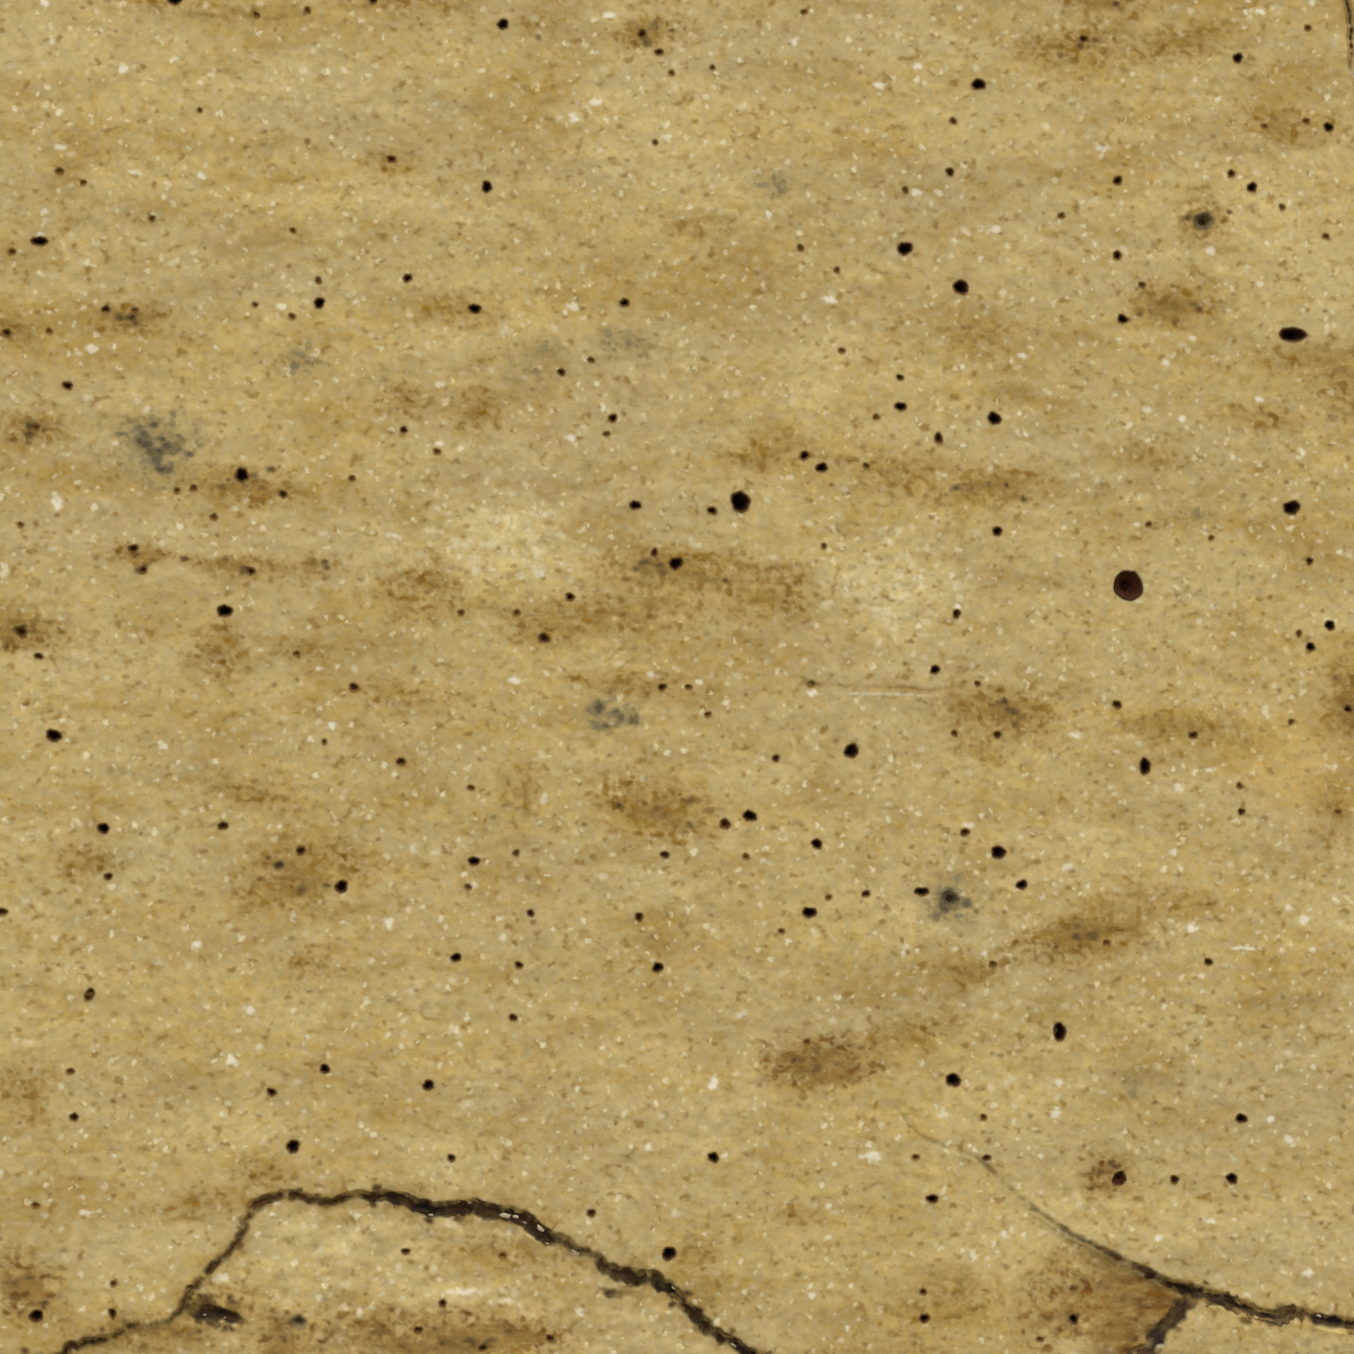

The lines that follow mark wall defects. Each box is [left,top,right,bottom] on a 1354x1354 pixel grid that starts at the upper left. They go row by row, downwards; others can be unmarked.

crack [1345,0,1354,66]
crack [61,1320,134,1354]
crack [173,1184,771,1354]
crack [1062,1228,1354,1354]